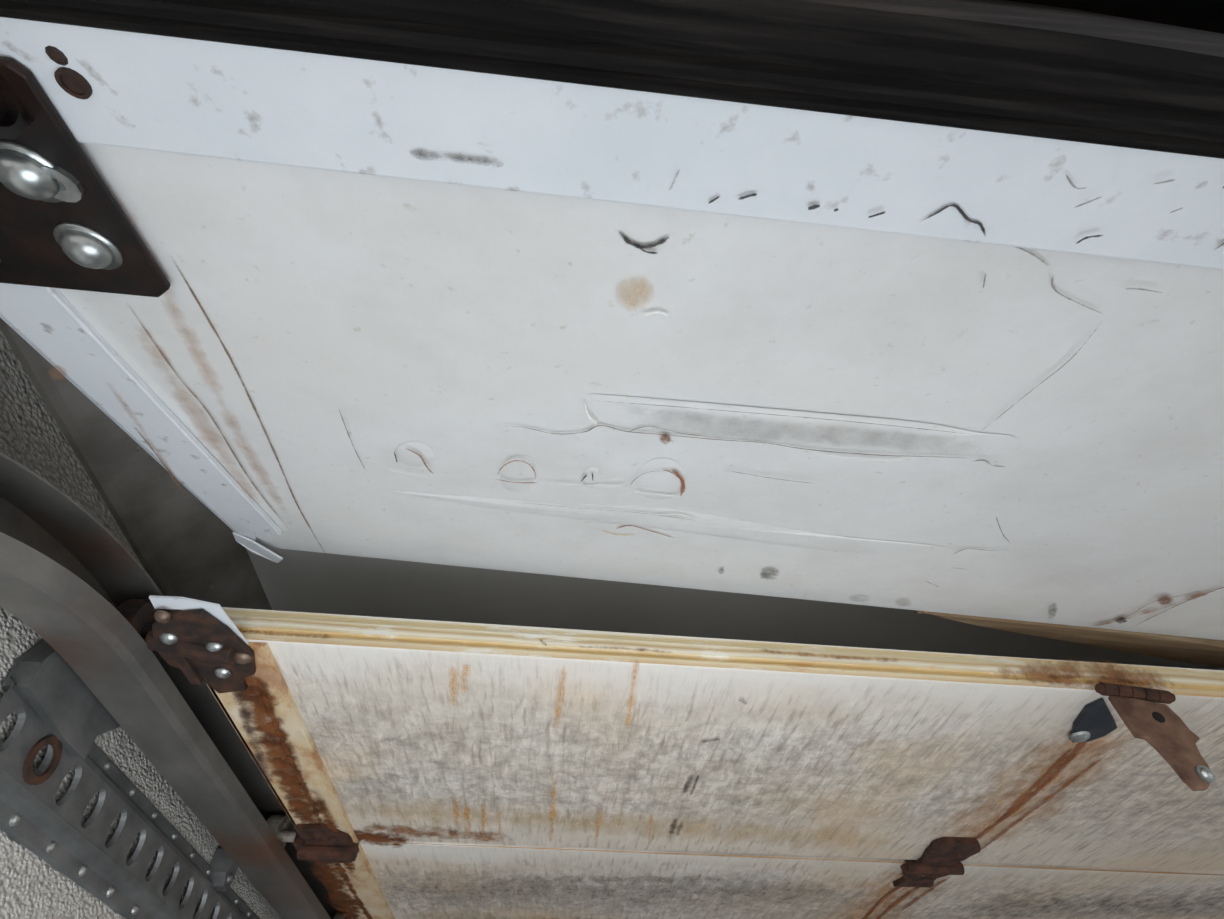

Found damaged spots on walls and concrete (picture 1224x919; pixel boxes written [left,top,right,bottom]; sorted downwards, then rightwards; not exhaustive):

corrosion [799,653,896,661]
corrosion [1003,662,1163,688]
corrosion [234,676,338,832]
corrosion [970,740,1105,850]
corrosion [311,860,373,919]
corrosion [354,826,947,919]
corrosion [963,864,1220,875]